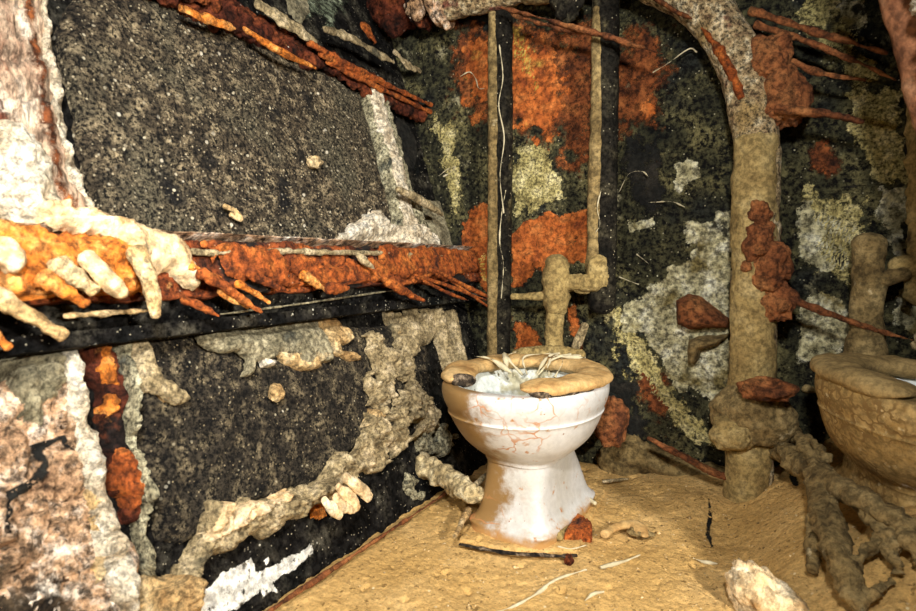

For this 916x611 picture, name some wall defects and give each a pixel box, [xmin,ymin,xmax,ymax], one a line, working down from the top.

rust [24,0,78,208]
rust [242,26,317,70]
rust [446,19,488,131]
rust [500,6,678,173]
rust [0,331,13,351]
rust [0,219,143,342]
rust [180,296,219,317]
rust [188,202,488,314]
rust [511,209,588,288]
peeling [0,352,68,427]
peeling [93,346,121,418]
rust [105,447,145,511]